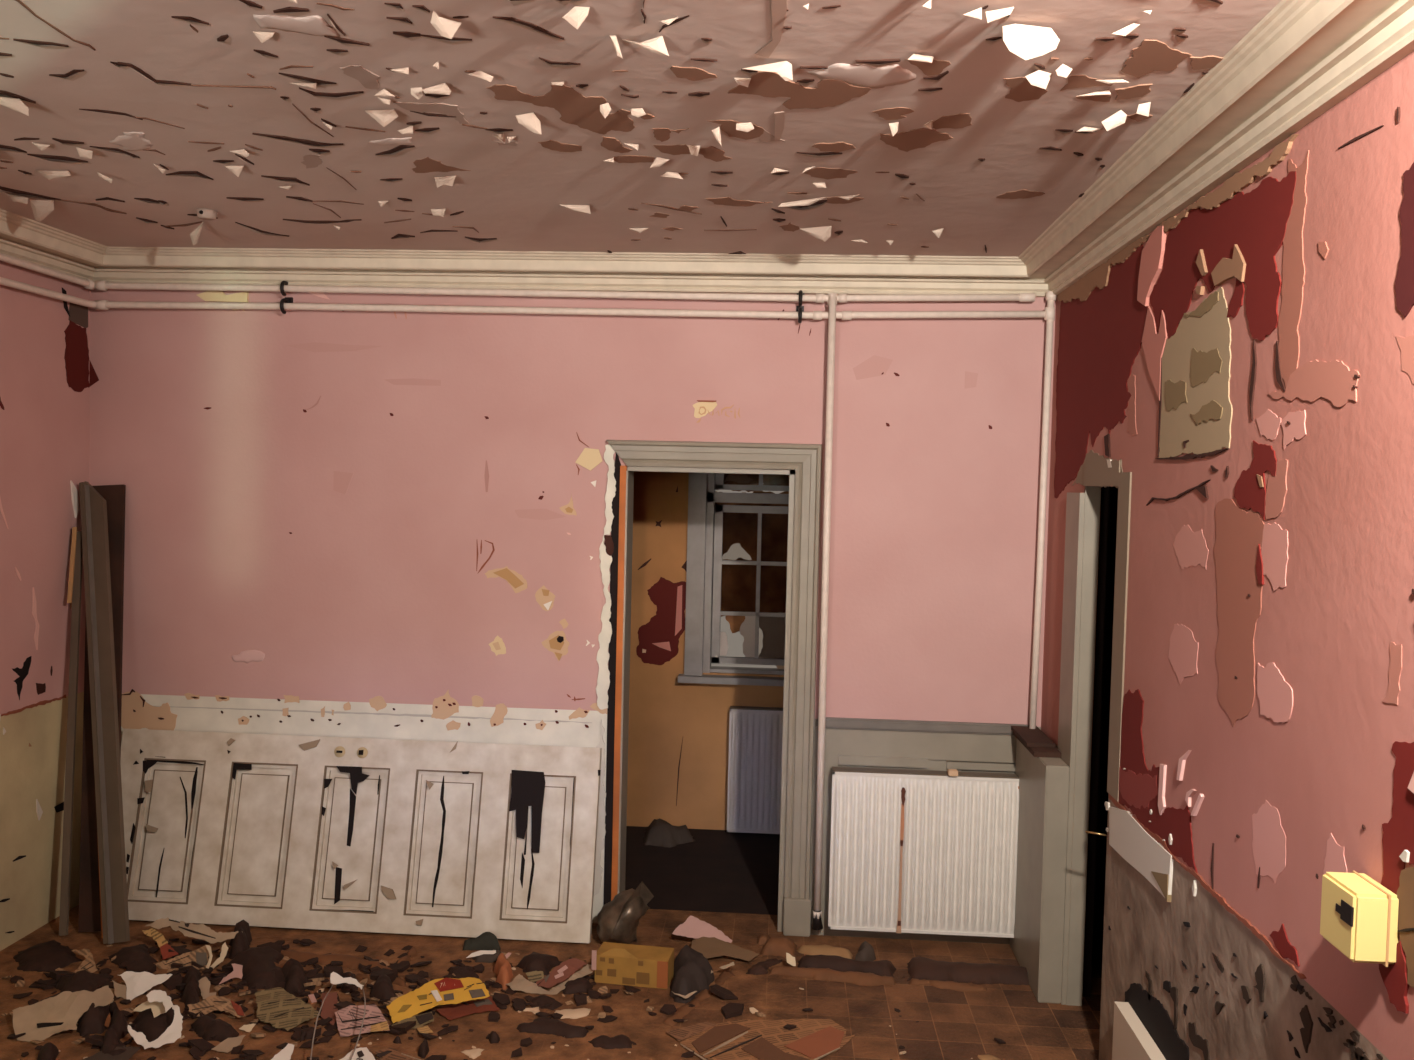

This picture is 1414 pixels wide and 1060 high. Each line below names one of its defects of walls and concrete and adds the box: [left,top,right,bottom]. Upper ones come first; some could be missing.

peeling [430,11,461,39]
peeling [468,71,764,179]
peeling [728,61,871,110]
peeling [963,7,1224,132]
peeling [1395,163,1414,317]
peeling [64,320,99,392]
peeling [1054,171,1296,498]
spalling [336,766,370,846]
crack [432,776,446,907]
spalling [509,770,545,909]
peeling [1109,689,1198,902]
peeling [1379,741,1414,1014]